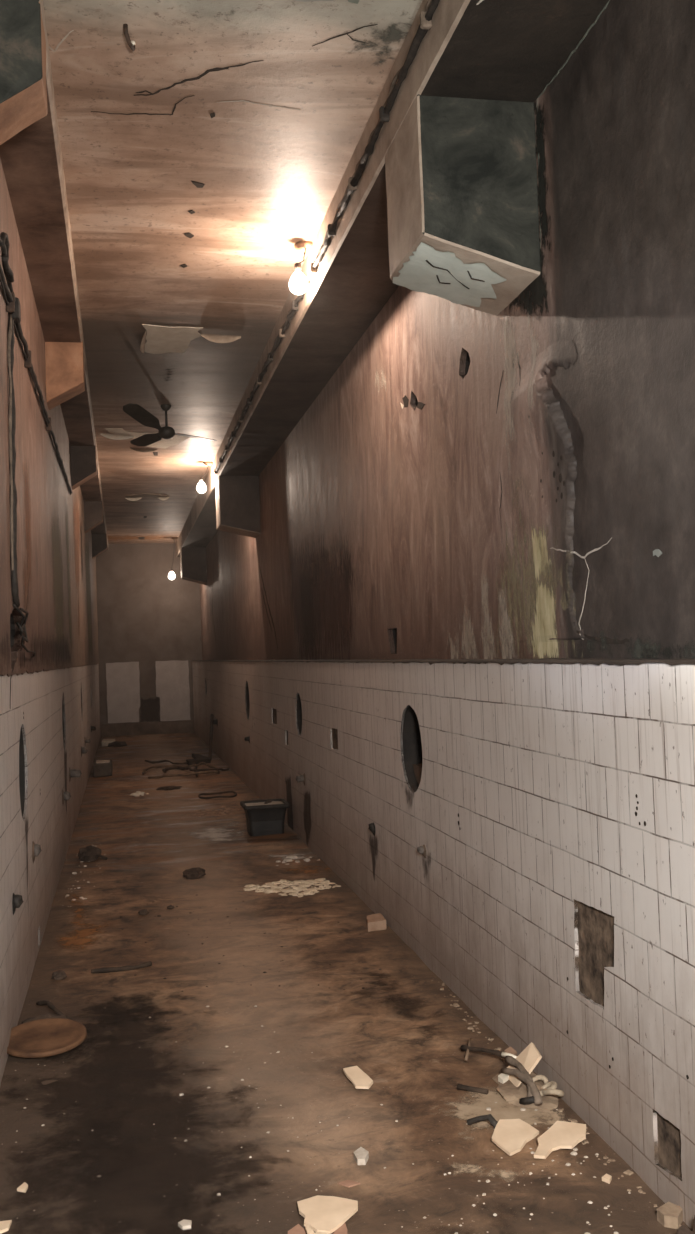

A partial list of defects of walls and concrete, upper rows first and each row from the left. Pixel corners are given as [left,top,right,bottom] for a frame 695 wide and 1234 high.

crack [91,60,300,115]
peeling [393,242,507,307]
peeling [140,324,241,354]
peeling [567,899,614,1008]
peeling [431,977,509,1068]
spalling [508,1108,683,1229]